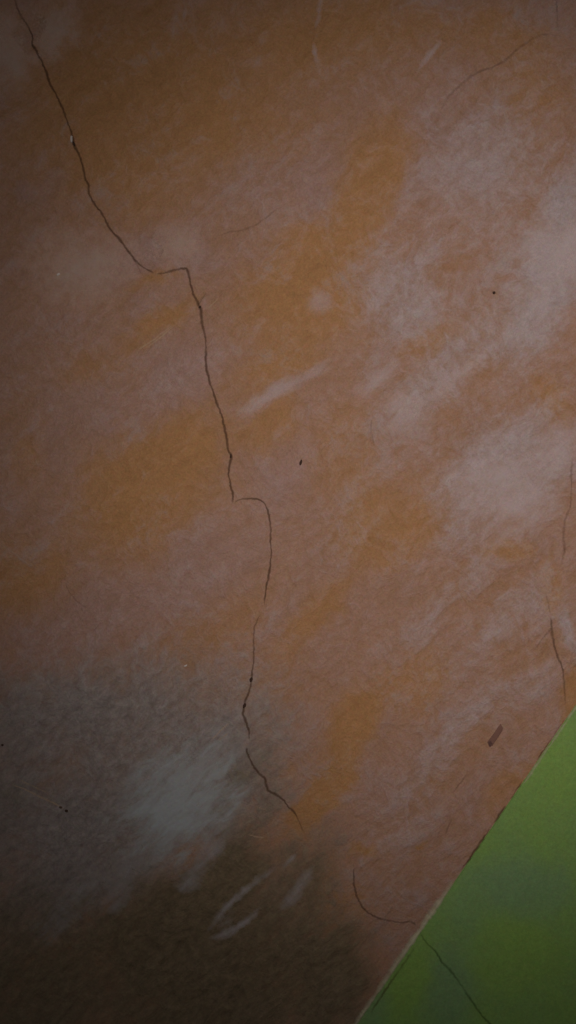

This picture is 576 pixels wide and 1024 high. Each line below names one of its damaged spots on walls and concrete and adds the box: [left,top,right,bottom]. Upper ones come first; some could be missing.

crack [30,31,136,261]
crack [205,356,272,596]
crack [242,677,295,813]